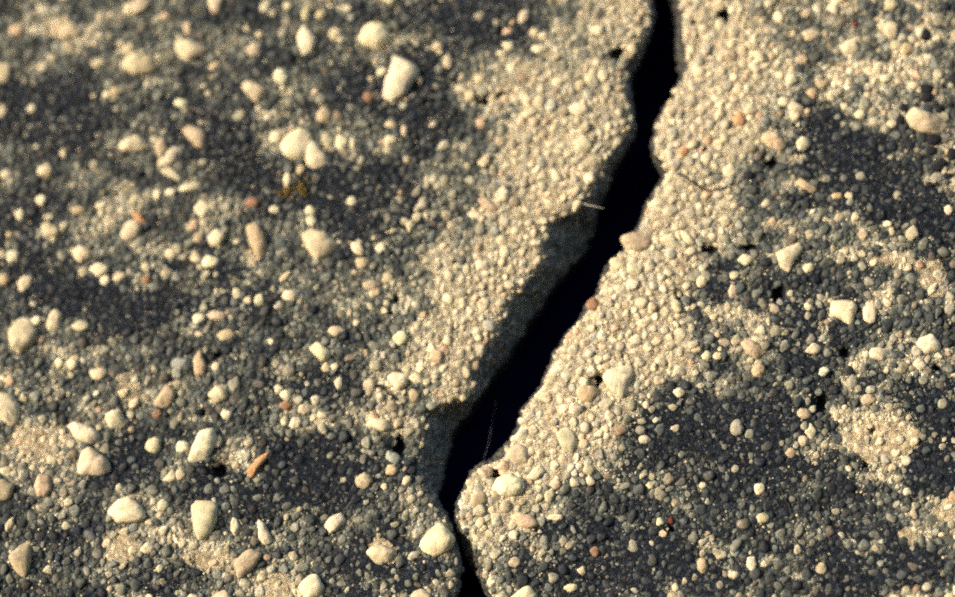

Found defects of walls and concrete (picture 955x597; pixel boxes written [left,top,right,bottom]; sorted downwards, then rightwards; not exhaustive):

crack [348,383,406,408]
crack [417,0,737,597]